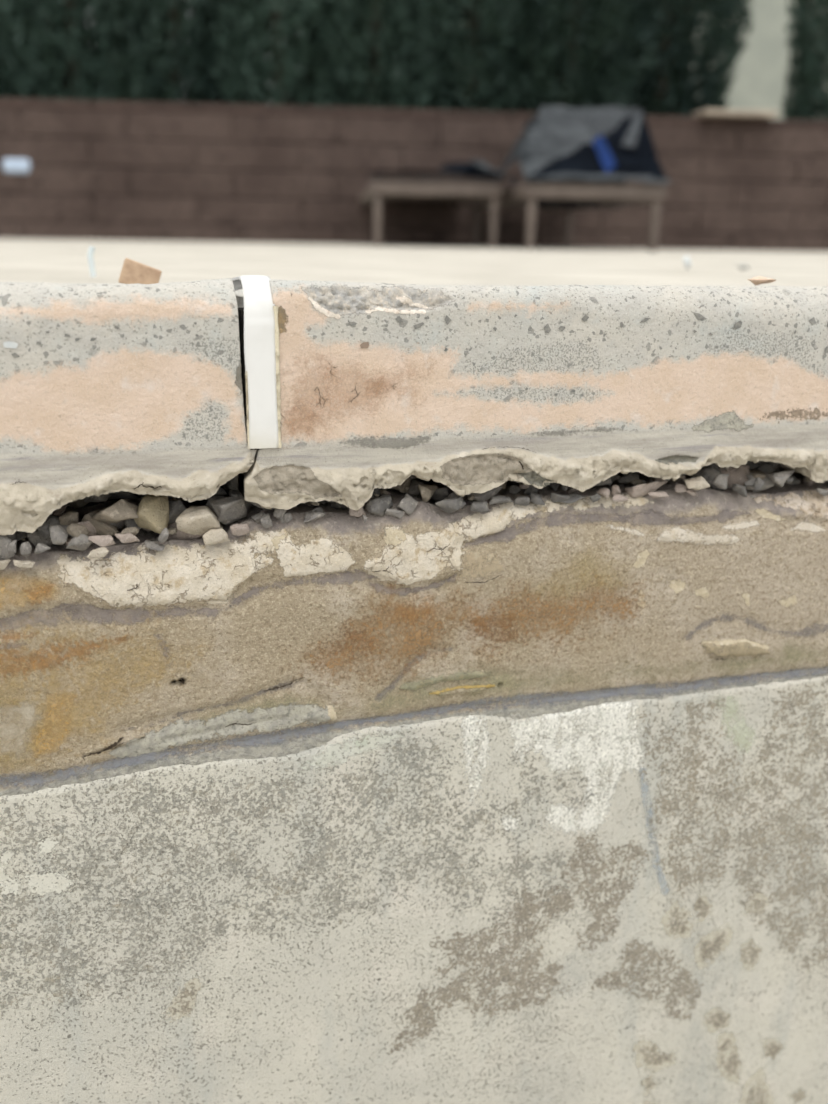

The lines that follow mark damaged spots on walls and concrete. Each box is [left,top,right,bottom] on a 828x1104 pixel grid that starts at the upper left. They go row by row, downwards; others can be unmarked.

spalling [656,455,698,465]
peeling [56,453,654,608]
peeling [632,489,828,569]